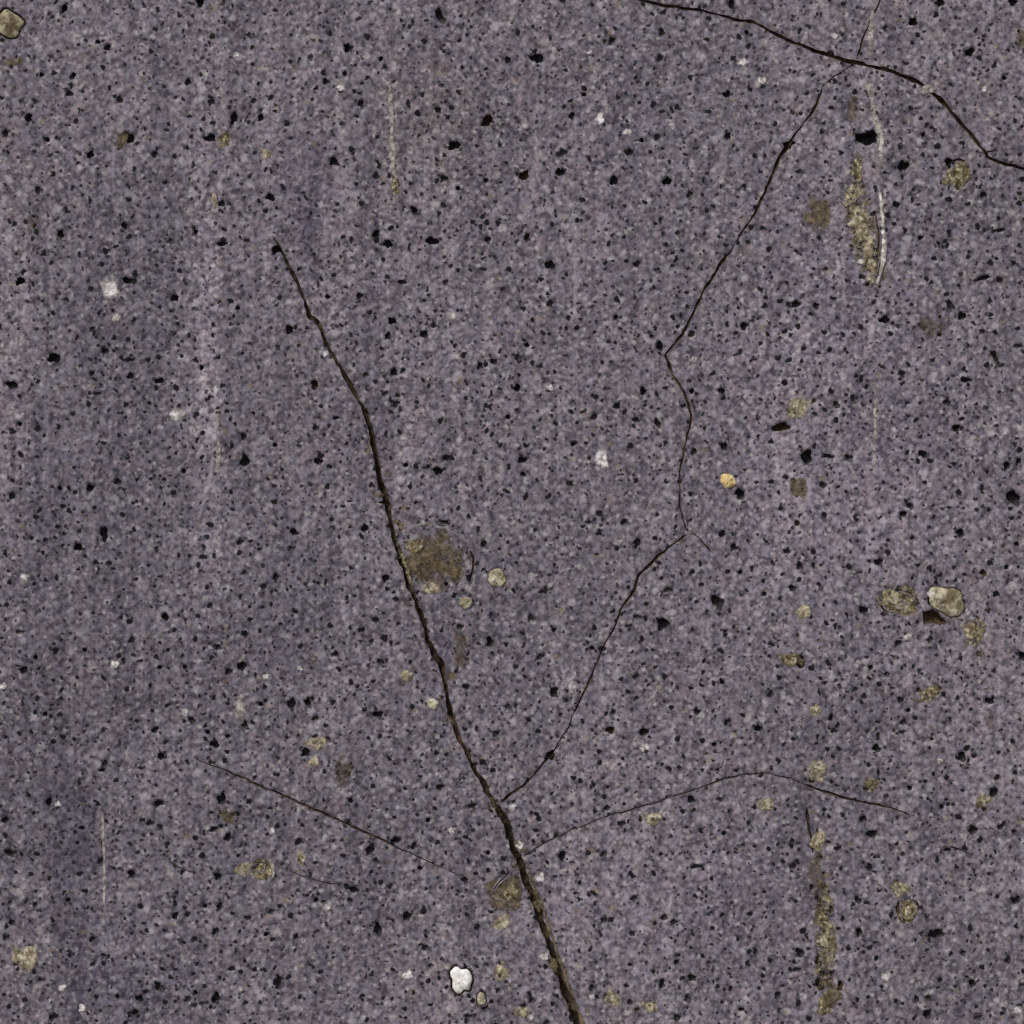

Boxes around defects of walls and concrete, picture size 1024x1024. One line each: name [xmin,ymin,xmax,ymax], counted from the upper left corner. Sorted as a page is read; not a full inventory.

crack [270,0,1024,1024]
crack [168,861,202,876]
crack [192,755,472,881]